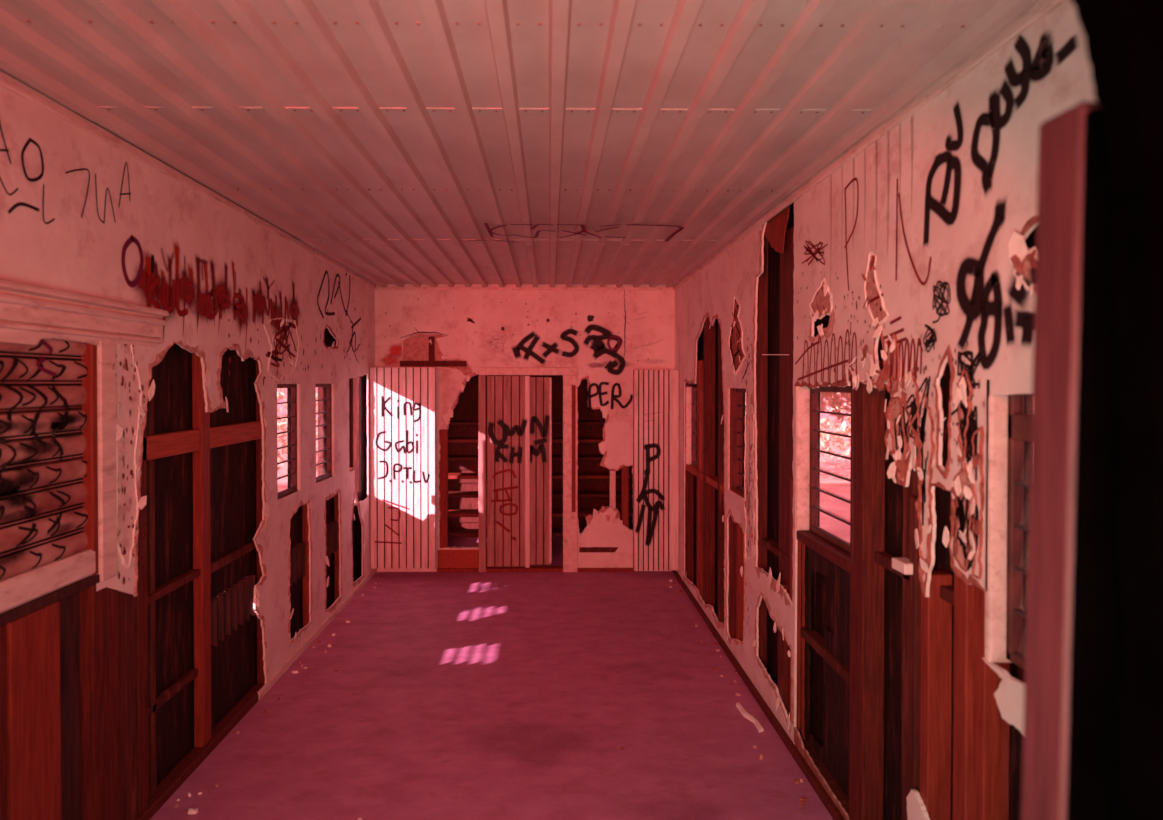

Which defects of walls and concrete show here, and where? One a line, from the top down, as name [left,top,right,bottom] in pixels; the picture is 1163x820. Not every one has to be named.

peeling [113,317,299,649]
flaking render [288,489,366,644]
peeling [400,333,476,429]
peeling [586,506,620,525]
flaking render [580,376,633,486]
peeling [682,224,794,733]
flaking render [794,251,985,597]